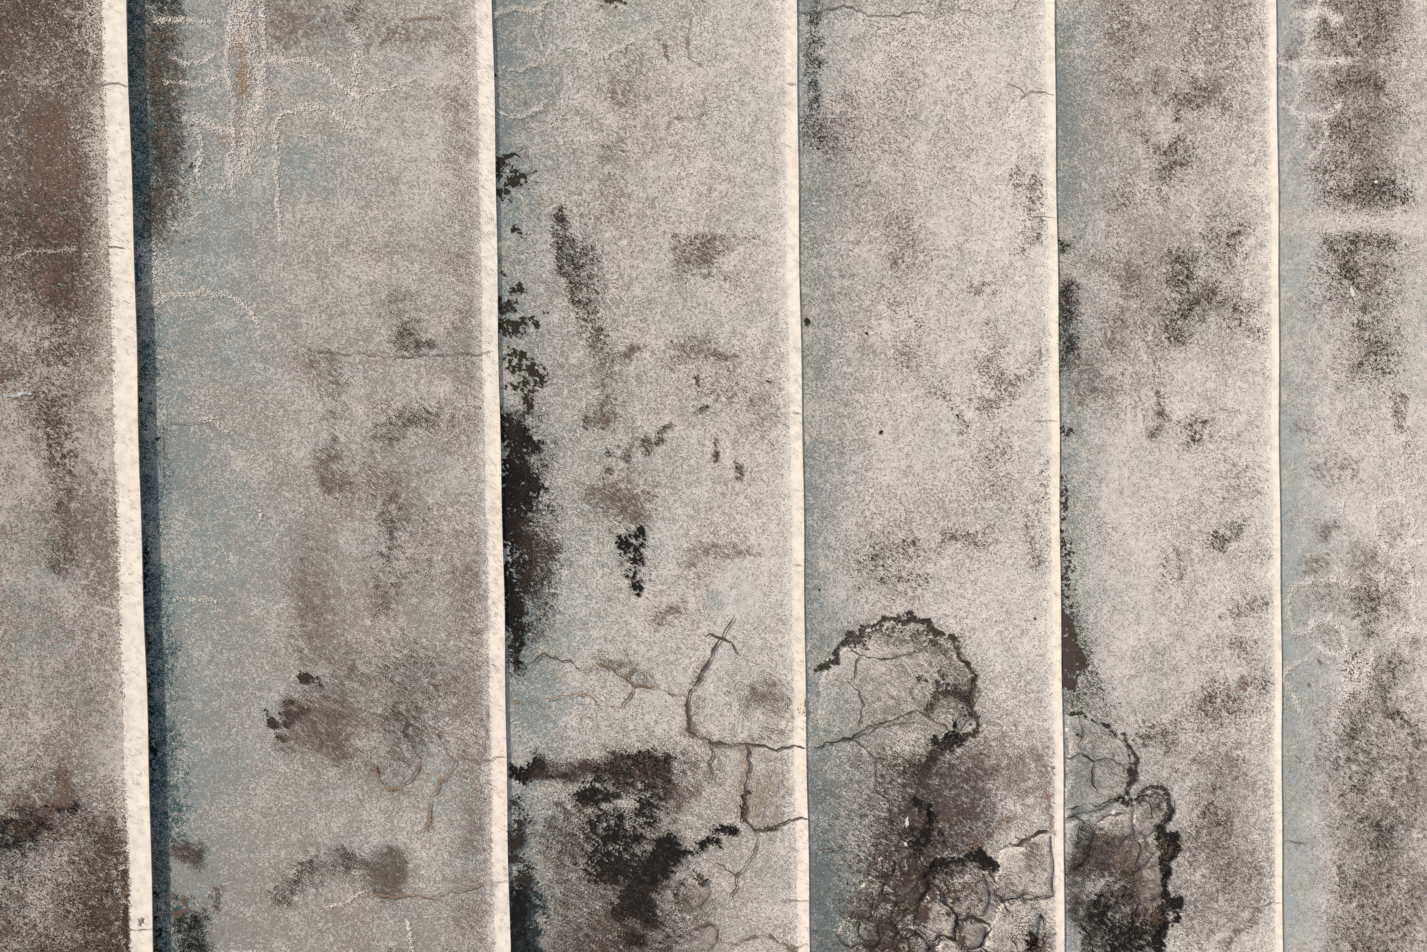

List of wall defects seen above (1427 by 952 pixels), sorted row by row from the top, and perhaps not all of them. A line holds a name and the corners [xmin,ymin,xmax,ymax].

mould [496,152,539,203]
damp [510,204,652,433]
damp [498,271,571,685]
damp [615,518,647,597]
damp [0,798,79,871]
damp [120,868,130,950]
damp [508,657,795,952]
crack [374,618,1164,952]
spalling [887,721,1018,883]